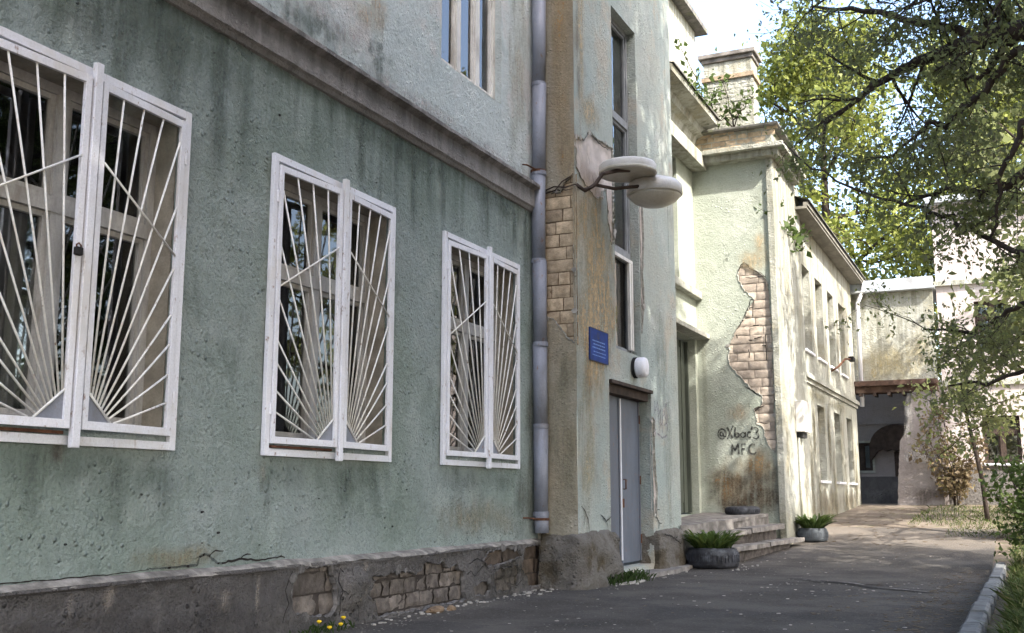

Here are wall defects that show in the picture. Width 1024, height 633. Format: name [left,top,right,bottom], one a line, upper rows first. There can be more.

spalling [545,130,617,345]
spalling [726,263,777,452]
crack [0,550,293,620]
water stain [722,473,779,508]